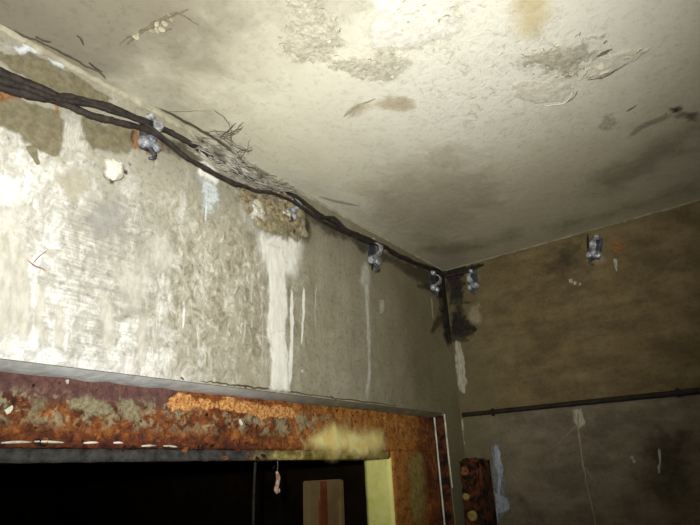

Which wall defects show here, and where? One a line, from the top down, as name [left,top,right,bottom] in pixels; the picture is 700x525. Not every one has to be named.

spalling [276,0,464,81]
spalling [513,32,650,107]
damp [231,161,346,391]
damp [381,252,484,393]
corrosion [167,392,297,421]
damp [494,445,503,523]
crack [557,408,596,525]